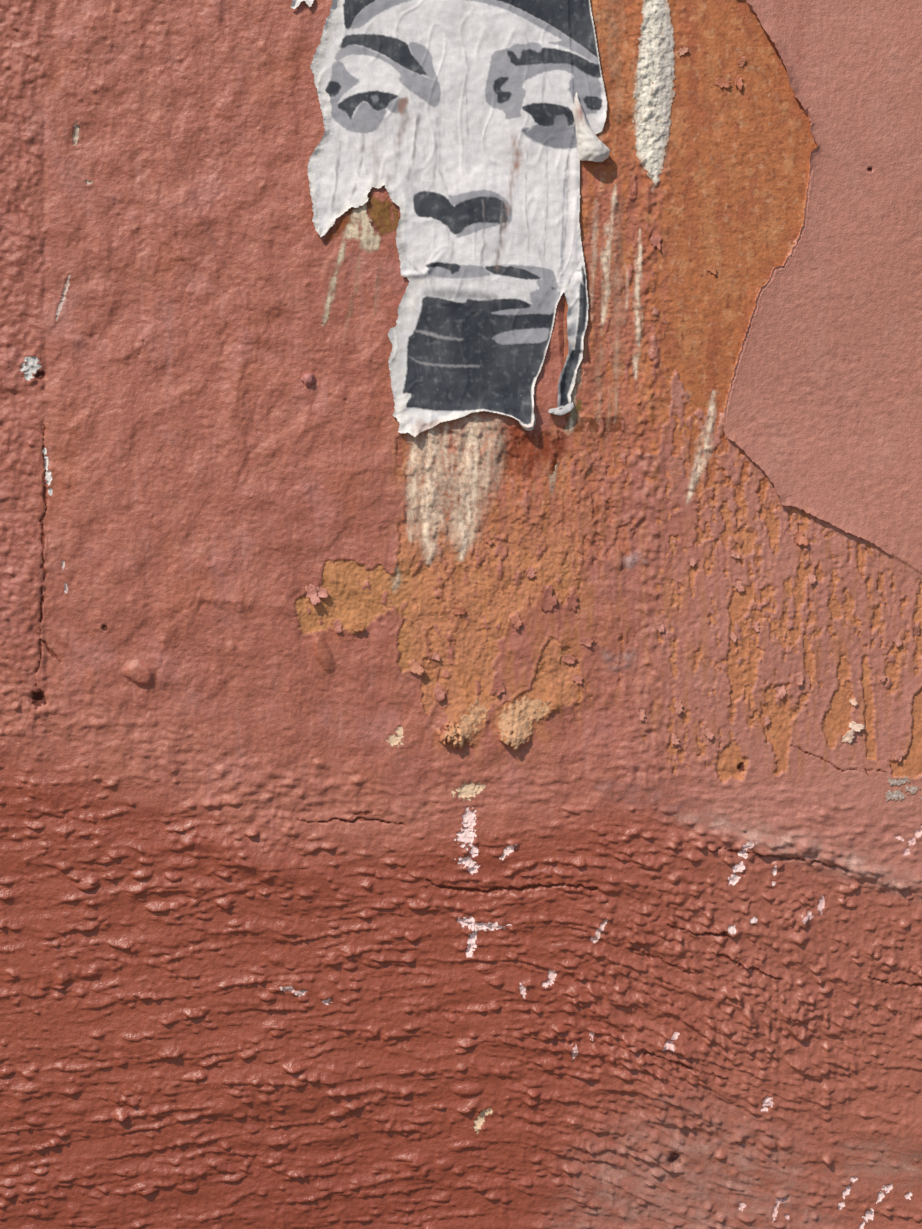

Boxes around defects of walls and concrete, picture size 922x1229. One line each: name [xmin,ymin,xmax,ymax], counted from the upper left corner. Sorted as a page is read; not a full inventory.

peeling [294,0,922,801]
crack [35,427,58,687]
crack [791,745,887,775]
crack [296,811,406,826]
peeling [451,781,486,874]
peeling [499,844,518,860]
crack [427,879,597,895]
peeling [457,916,511,957]
crack [869,977,922,988]